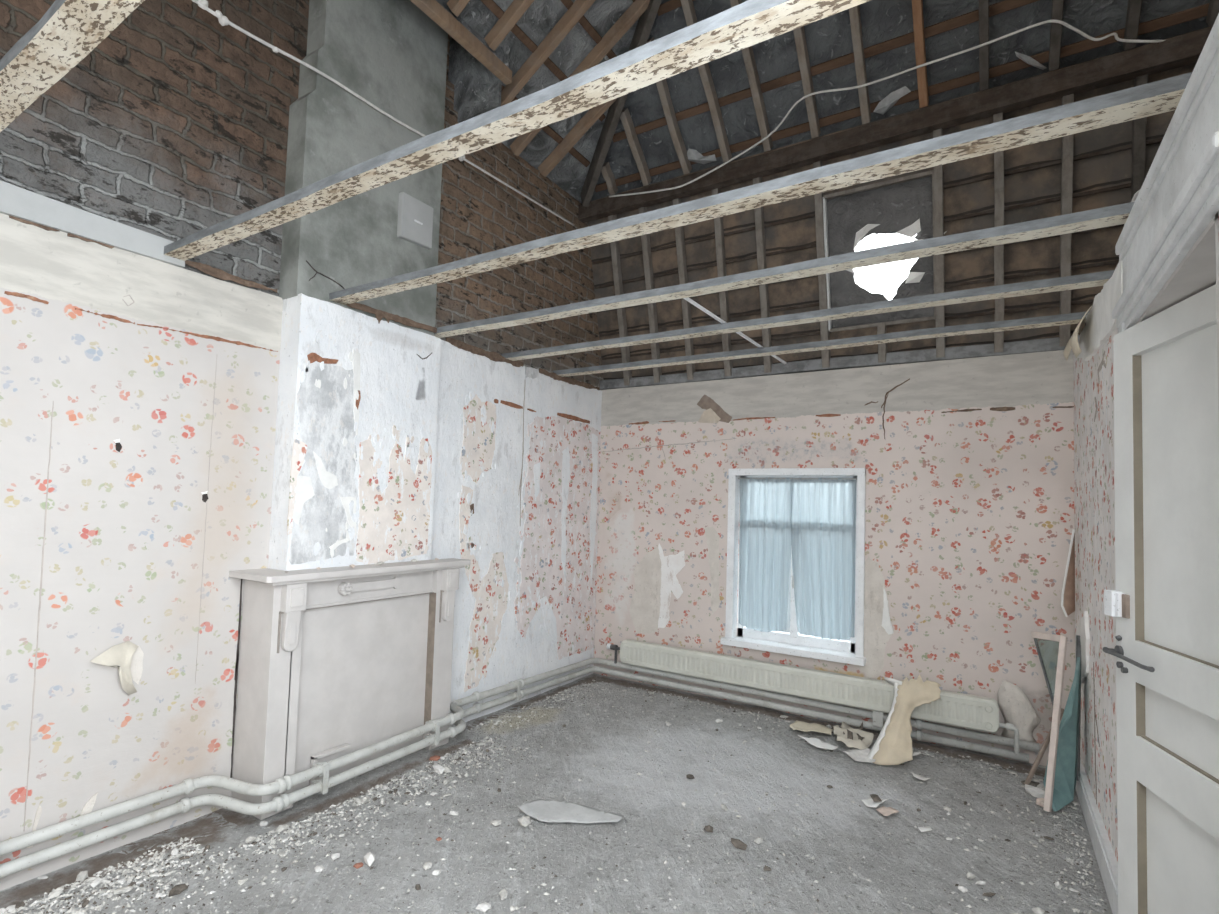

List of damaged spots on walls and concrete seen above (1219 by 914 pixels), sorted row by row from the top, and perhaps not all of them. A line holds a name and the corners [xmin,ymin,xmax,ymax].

crack [865,378,910,439]
peeling [561,447,570,583]
peeling [590,434,598,584]
peeling [658,544,685,628]
peeling [89,641,144,695]